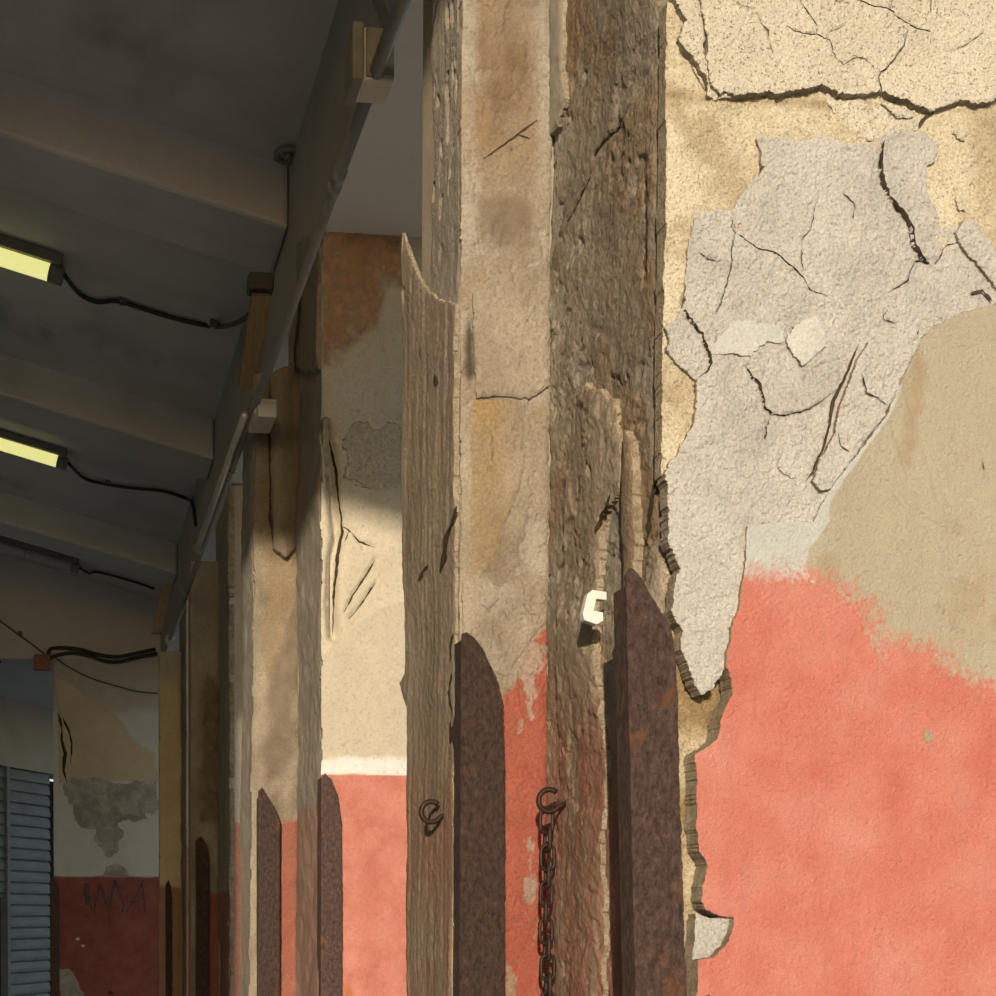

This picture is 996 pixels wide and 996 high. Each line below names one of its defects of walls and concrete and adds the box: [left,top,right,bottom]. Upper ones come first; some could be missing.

crack [736,0,932,92]
crack [483,120,537,159]
crack [684,309,713,375]
crack [699,195,827,311]
crack [878,141,958,341]
crack [971,289,992,301]
crack [746,344,888,482]
spalling [654,0,996,964]
flaking render [342,233,550,996]
crack [58,713,73,783]
peeling [56,679,159,877]